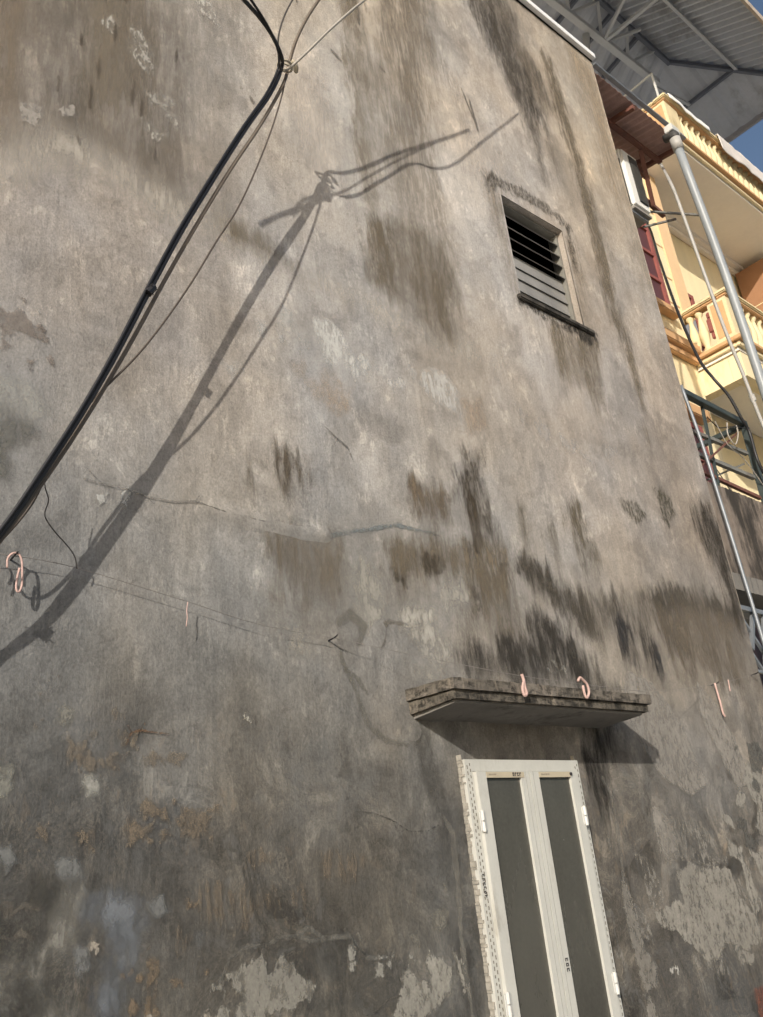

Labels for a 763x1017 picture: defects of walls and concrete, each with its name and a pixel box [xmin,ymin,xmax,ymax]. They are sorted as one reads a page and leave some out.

leakage [487,172,577,268]
leakage [525,48,612,298]
crack [84,468,226,512]
leakage [313,451,508,663]
leakage [498,610,586,683]
leakage [518,551,633,653]
leakage [642,502,740,667]
peeling [621,729,763,1017]
peeling [204,954,316,1017]
peeling [348,946,356,972]
peeling [375,954,395,978]
peeling [392,949,466,1017]